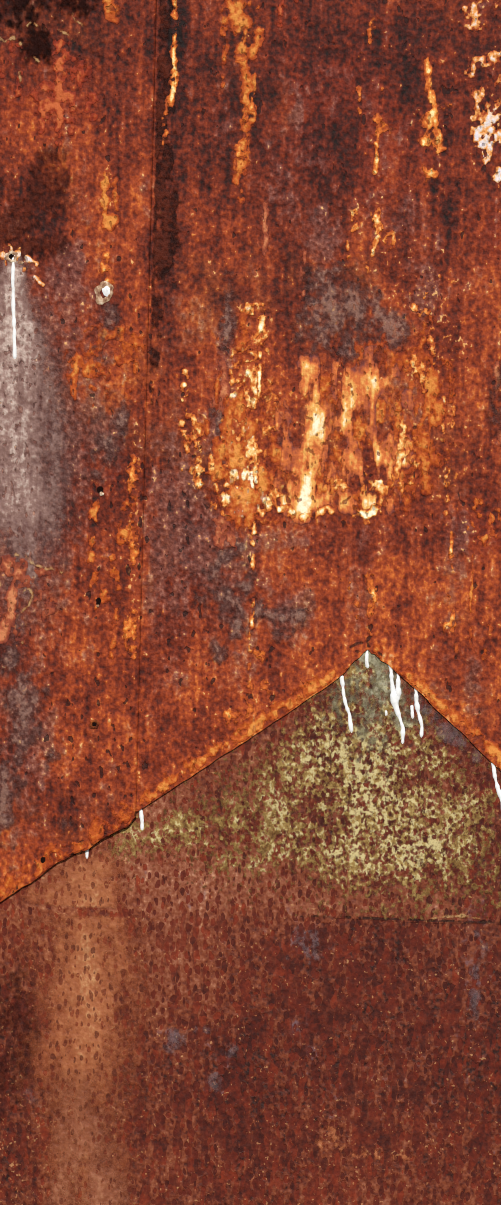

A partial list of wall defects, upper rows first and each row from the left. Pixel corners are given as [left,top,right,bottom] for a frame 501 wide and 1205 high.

rust [0,39,99,146]
rust [162,0,179,145]
rust [219,0,299,204]
rust [418,57,452,154]
rust [462,0,498,32]
rust [464,50,501,188]
rust [0,243,45,287]
rust [345,207,396,273]
leakage [0,149,70,595]
rust [178,292,459,551]
rust [87,453,140,660]
rust [348,572,501,769]